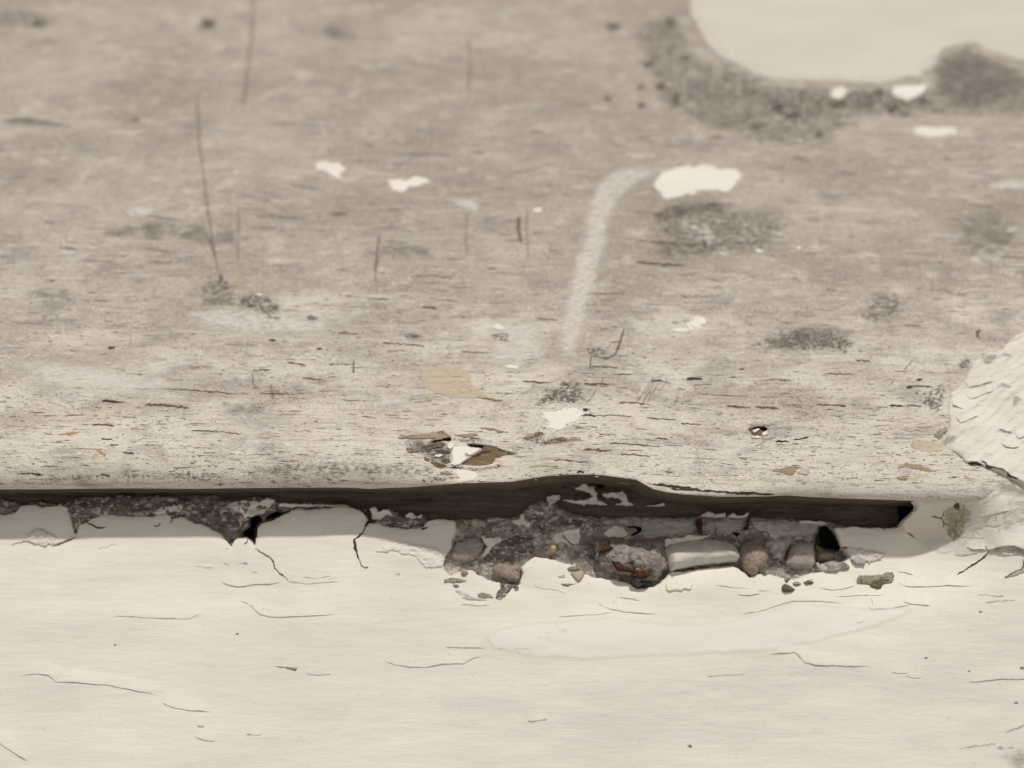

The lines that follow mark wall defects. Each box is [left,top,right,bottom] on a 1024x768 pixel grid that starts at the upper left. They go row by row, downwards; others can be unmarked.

water stain [636,19,1024,141]
peeling [435,443,482,466]
crack [53,522,105,546]
peeling [0,494,429,547]
crack [225,539,288,580]
crack [333,503,390,568]
peeling [375,484,973,614]
crack [957,551,989,575]